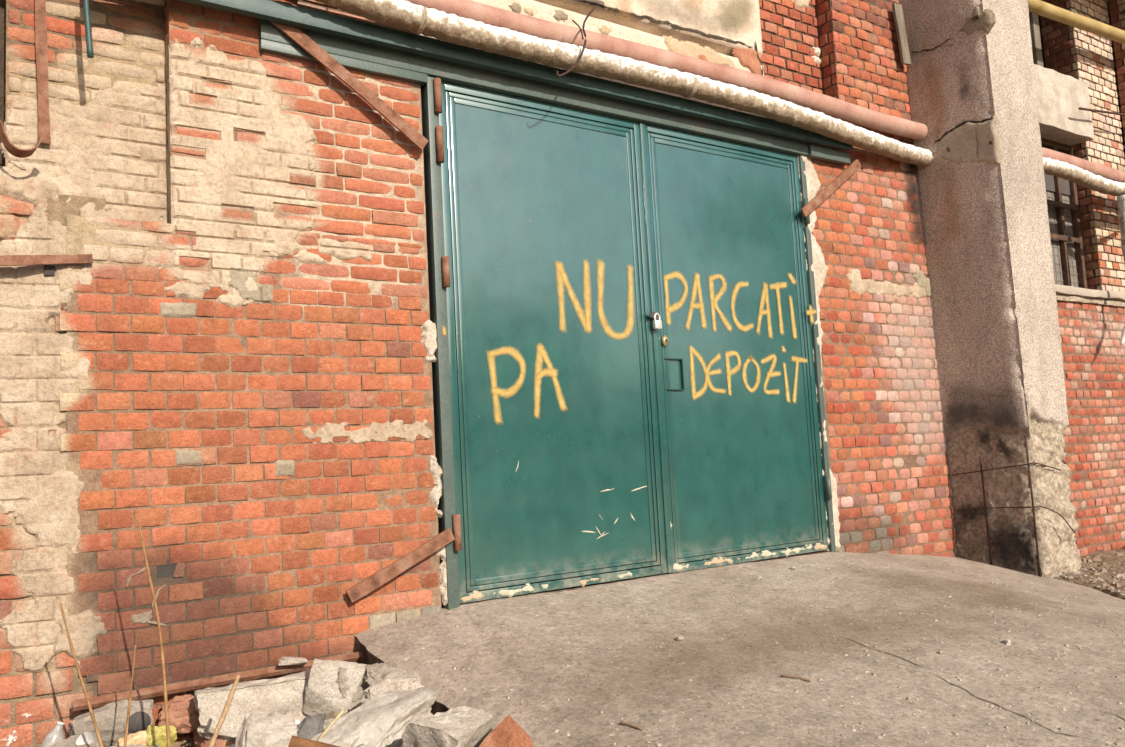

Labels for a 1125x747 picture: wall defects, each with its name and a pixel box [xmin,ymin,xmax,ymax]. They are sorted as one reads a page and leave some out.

crack [912,39,952,53]
spalling [958,6,996,36]
crack [935,118,994,156]
flaking render [797,155,828,402]
spalling [0,37,329,674]
damp [947,407,1024,430]
flaking render [704,419,841,566]
spalling [946,390,1082,578]
peeling [461,583,548,602]
crack [847,638,1088,738]